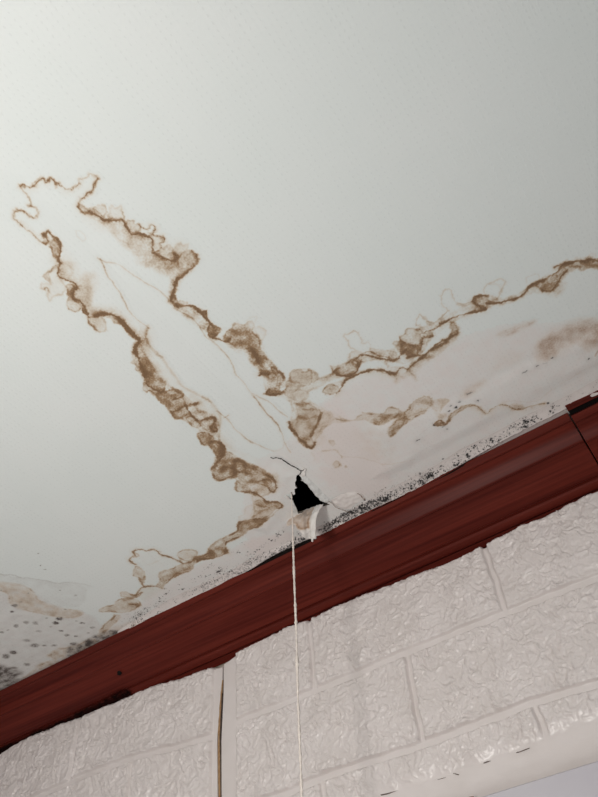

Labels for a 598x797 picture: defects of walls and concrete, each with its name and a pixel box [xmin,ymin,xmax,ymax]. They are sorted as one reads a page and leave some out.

leakage [0,169,598,690]